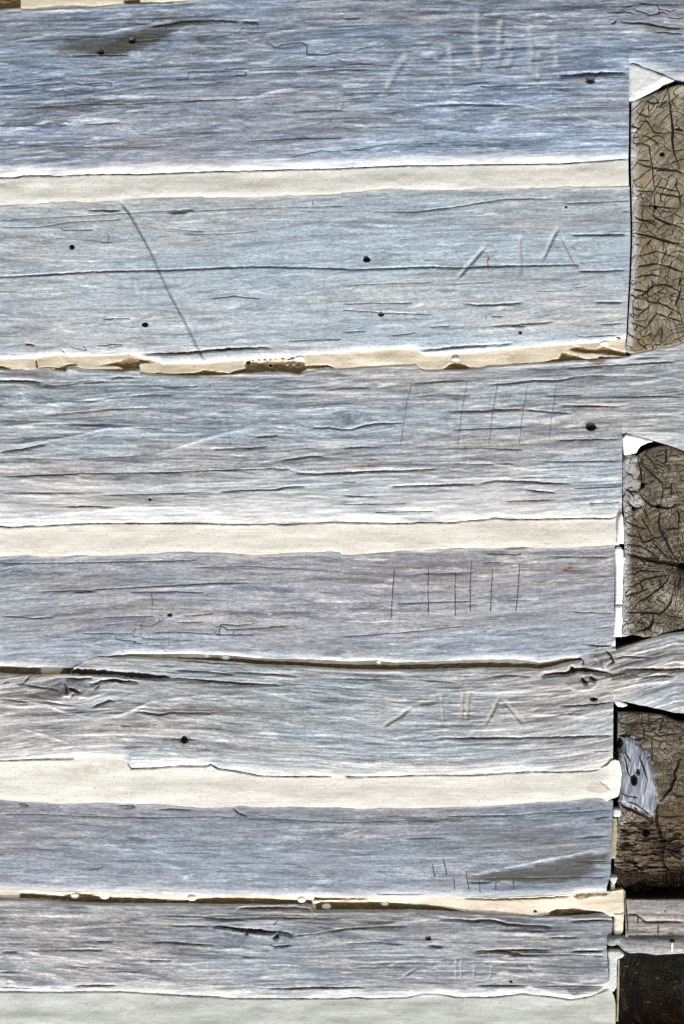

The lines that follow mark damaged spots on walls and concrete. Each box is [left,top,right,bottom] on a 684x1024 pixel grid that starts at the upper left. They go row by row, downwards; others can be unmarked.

spalling [544,347,630,363]
spalling [103,358,333,376]
spalling [444,362,468,370]